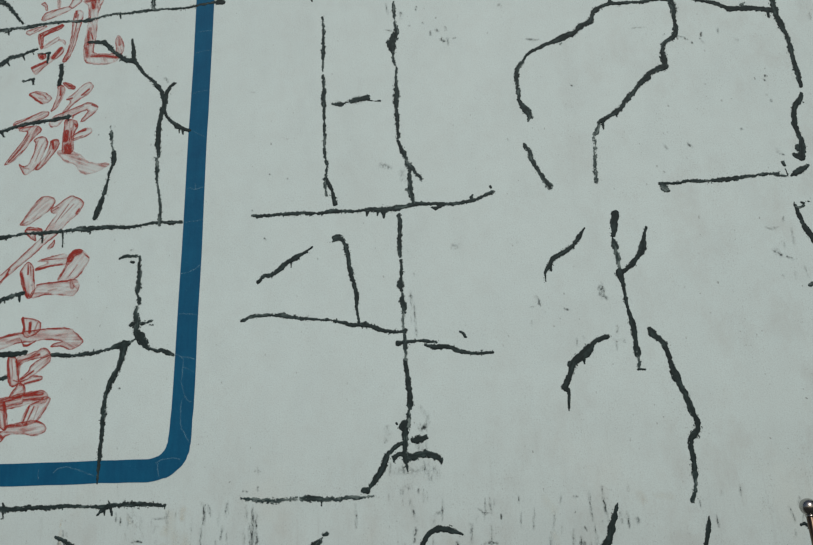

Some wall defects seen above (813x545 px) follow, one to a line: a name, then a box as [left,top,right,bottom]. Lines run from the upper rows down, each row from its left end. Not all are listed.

crack [0,0,226,248]
crack [514,0,810,192]
crack [239,0,495,507]
crack [544,227,585,283]
crack [793,201,813,243]
crack [0,254,175,520]
crack [561,333,610,411]
crack [609,210,711,545]
crack [420,525,464,545]
crack [602,503,619,545]